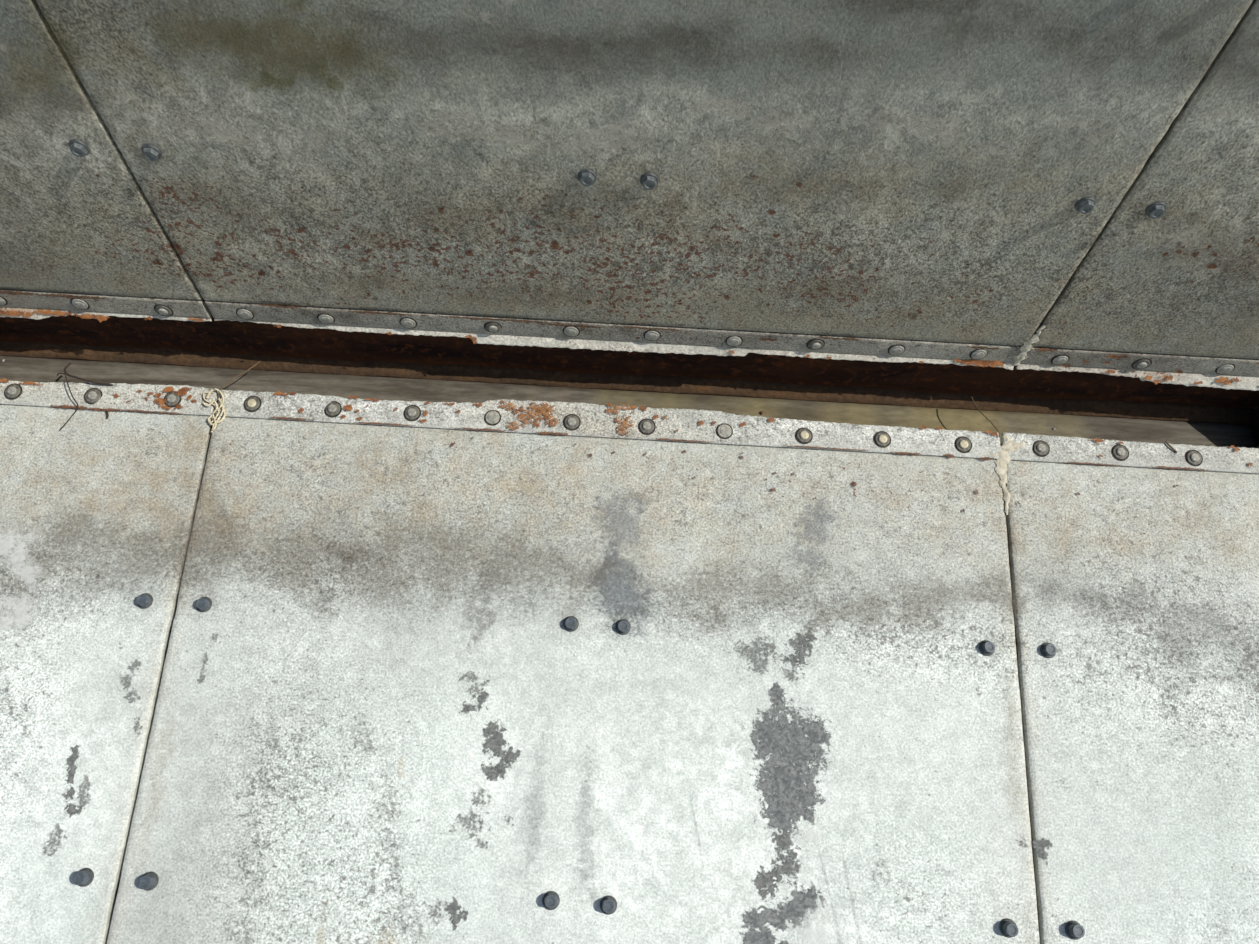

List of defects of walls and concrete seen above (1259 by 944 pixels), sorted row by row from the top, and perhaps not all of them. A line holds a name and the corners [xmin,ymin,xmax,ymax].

rust [152,222,281,285]
rust [391,228,513,298]
rust [525,194,638,279]
rust [1163,242,1220,269]
rust [50,386,197,414]
rust [341,396,430,426]
rust [954,346,1005,368]
rust [1194,376,1241,385]
damp [0,532,39,635]
damp [592,550,651,622]
peeling [450,671,521,849]
peeling [735,627,832,944]